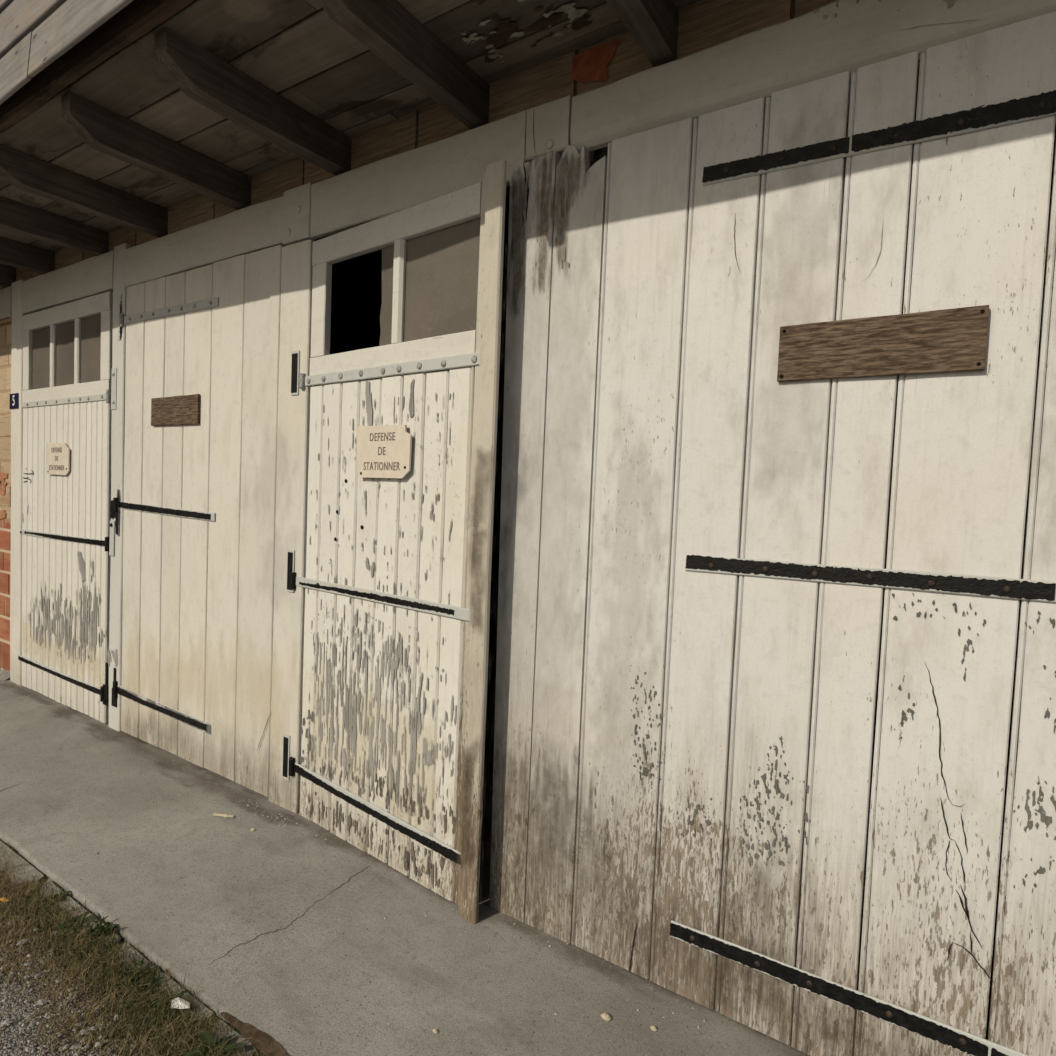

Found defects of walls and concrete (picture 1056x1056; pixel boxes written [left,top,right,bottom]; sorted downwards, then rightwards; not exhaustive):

peeling [318,379,454,515]
peeling [385,485,452,561]
peeling [300,534,457,835]
peeling [891,683,915,739]
peeling [892,593,986,681]
crack [209,866,370,965]
peeling [308,792,444,888]
peeling [677,797,714,841]
peeling [737,736,810,867]
crack [924,661,995,984]
peeling [1013,855,1054,892]
peeling [1013,775,1056,840]